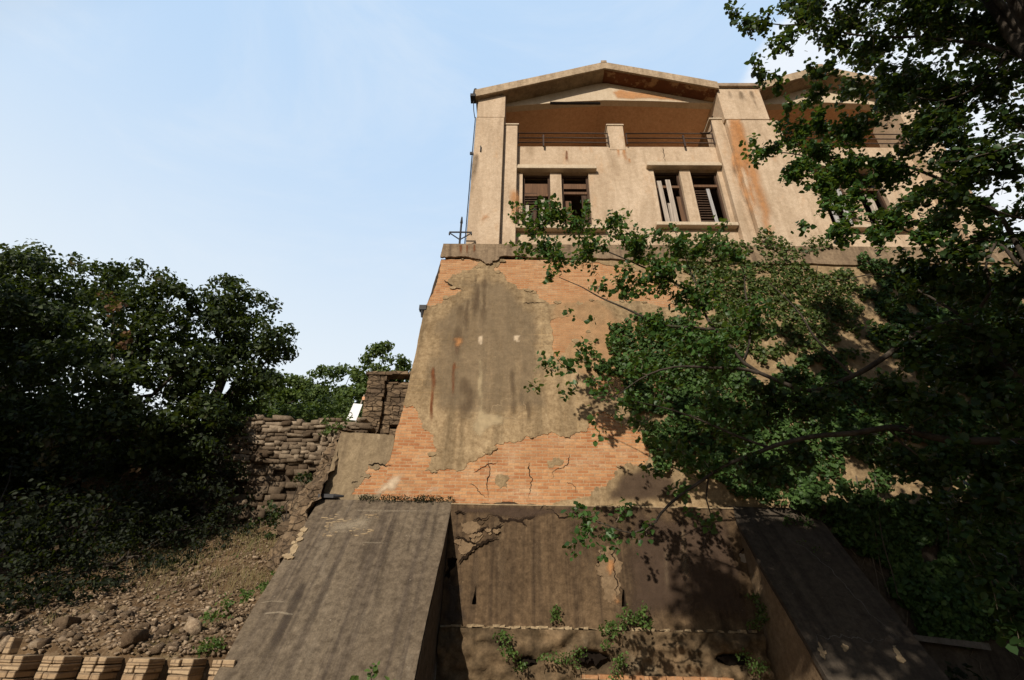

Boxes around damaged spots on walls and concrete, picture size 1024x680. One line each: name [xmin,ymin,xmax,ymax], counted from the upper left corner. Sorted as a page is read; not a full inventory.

corrosion [730,120,767,216]
flaking render [427,258,481,307]
flaking render [494,259,682,363]
water stain [474,410,502,435]
flaking render [352,405,652,505]
spalling [445,520,501,578]
crack [455,455,594,563]
spalling [596,546,623,603]